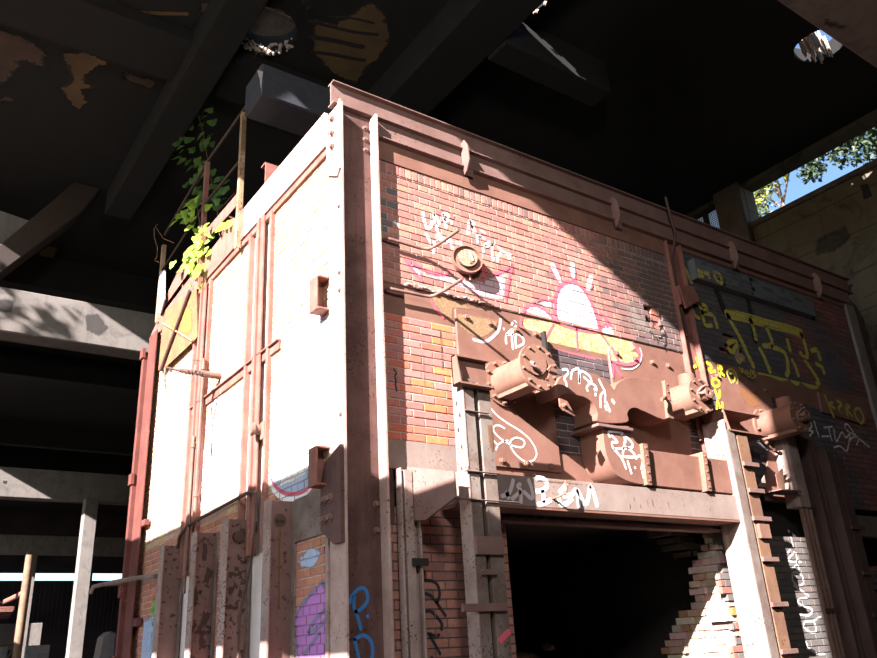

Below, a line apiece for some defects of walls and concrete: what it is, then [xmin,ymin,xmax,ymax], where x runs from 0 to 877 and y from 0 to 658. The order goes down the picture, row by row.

peeling [0,27,47,82]
peeling [61,52,107,109]
peeling [307,4,390,81]
spalling [647,307,661,331]